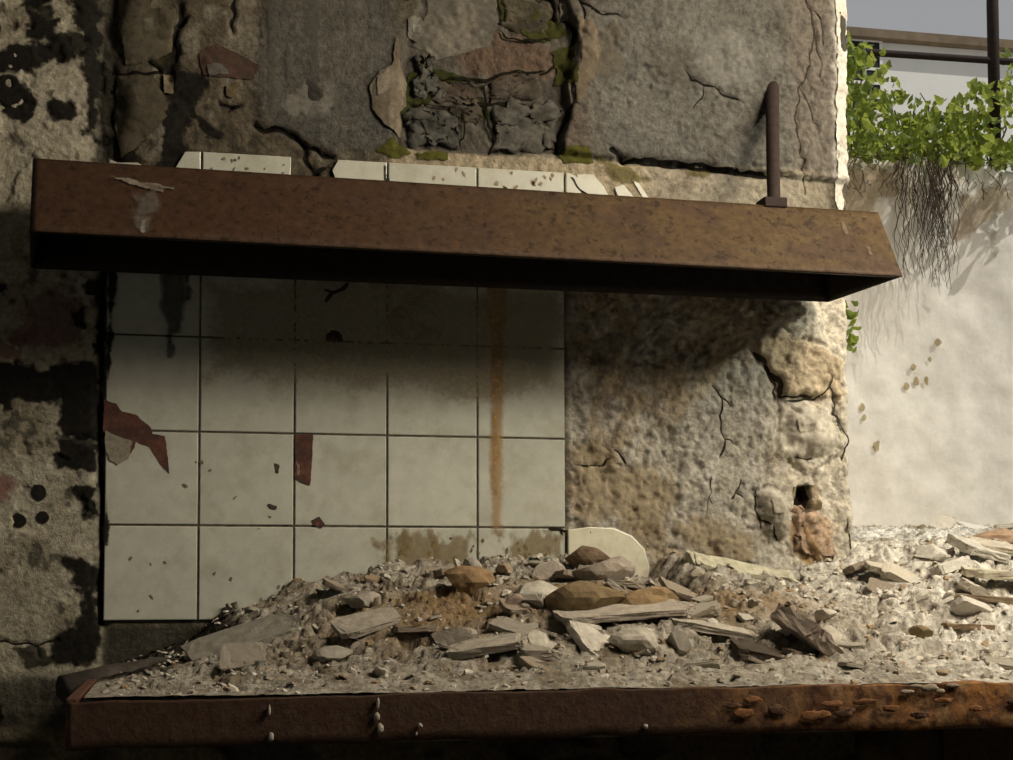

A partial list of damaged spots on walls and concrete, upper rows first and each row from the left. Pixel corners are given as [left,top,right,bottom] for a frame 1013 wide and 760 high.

flaking render [370,0,601,155]
crack [539,0,624,154]
crack [686,71,743,109]
crack [609,147,767,179]
water stain [161,274,191,357]
spalling [103,399,169,474]
spalling [295,434,313,485]
rust [490,288,506,531]
crack [705,386,777,541]
flaking render [791,484,835,559]
rust [733,695,763,719]
rust [801,698,900,721]